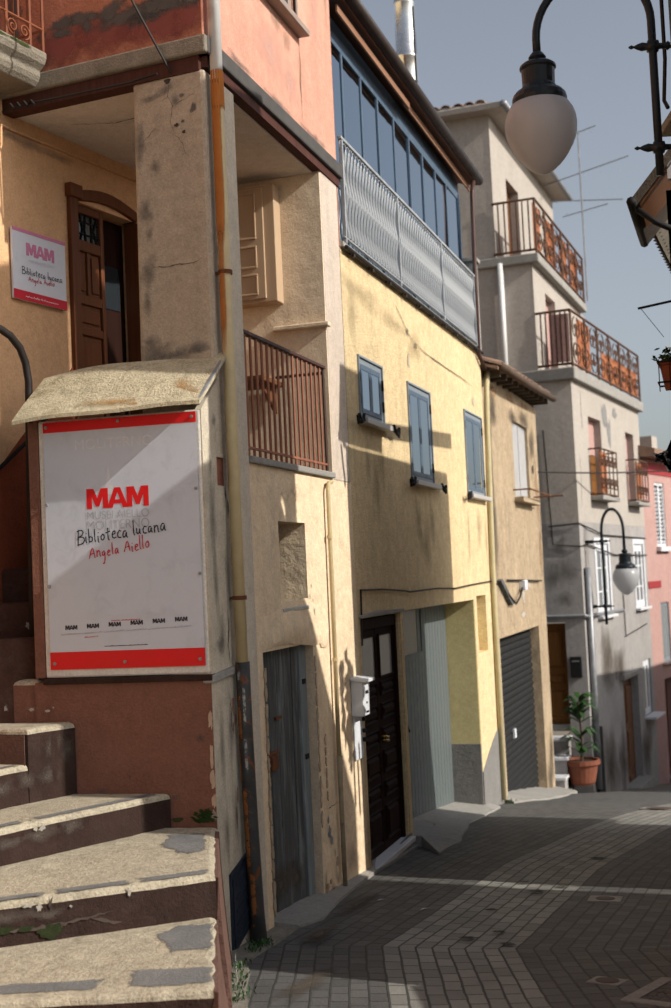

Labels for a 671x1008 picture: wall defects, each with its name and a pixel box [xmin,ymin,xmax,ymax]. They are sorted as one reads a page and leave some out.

corrosion [238,695,257,927]